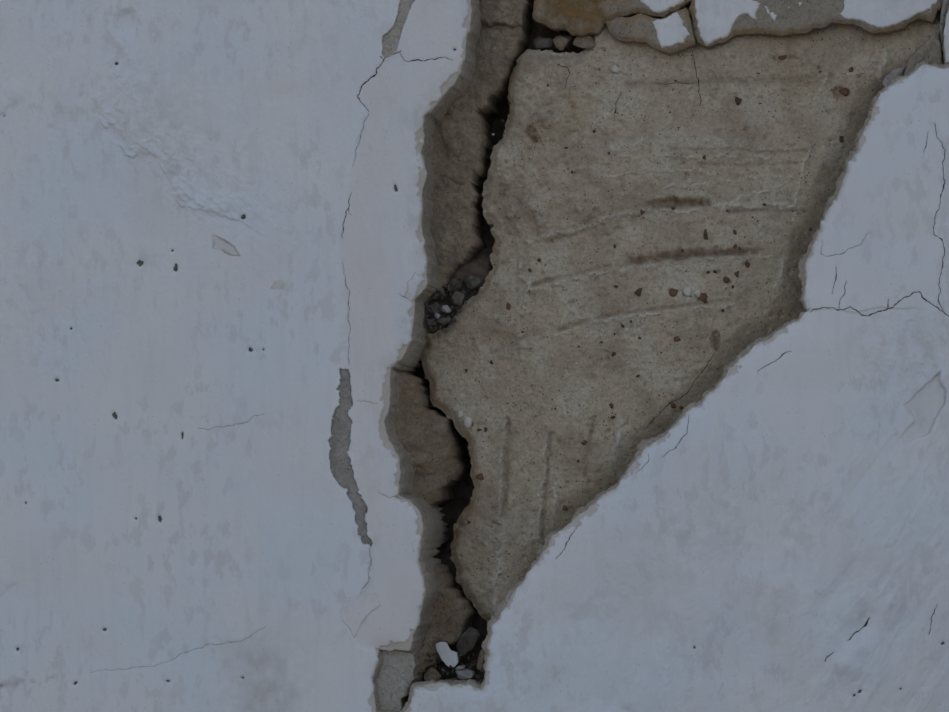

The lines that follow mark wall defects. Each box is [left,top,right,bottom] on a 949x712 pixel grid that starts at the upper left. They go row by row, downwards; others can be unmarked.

crack [353,51,453,166]
crack [490,104,510,145]
crack [526,0,586,87]
crack [400,180,495,334]
crack [811,123,948,316]
spalling [373,0,949,712]
peeling [328,368,372,546]
crack [433,438,488,680]